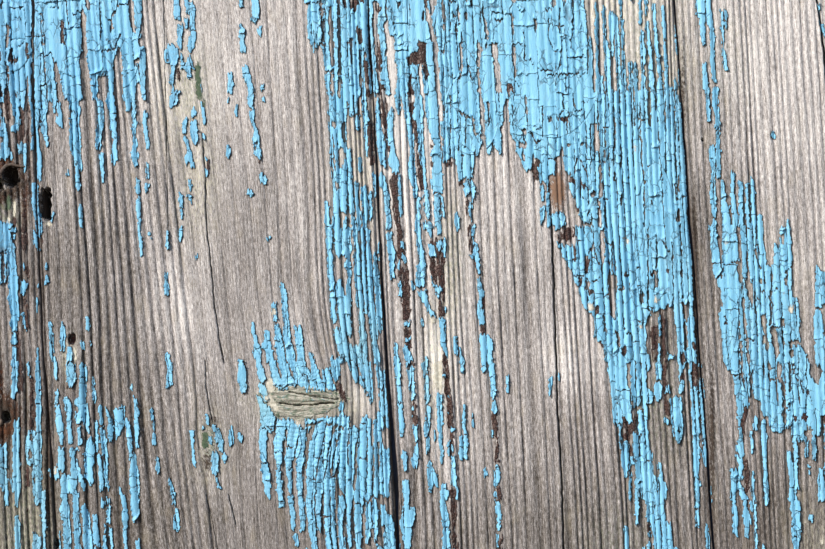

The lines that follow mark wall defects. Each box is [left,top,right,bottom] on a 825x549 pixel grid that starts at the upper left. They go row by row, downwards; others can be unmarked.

peeling [164,0,196,109]
crack [816,0,825,73]
corrosion [0,159,31,220]
peeling [0,0,152,257]
peeling [181,101,206,169]
peeling [227,64,265,160]
crack [205,210,224,421]
peeling [251,0,710,549]
peeling [695,0,825,549]
corrosion [0,365,25,461]
peeling [0,219,140,549]
peeling [189,414,243,490]